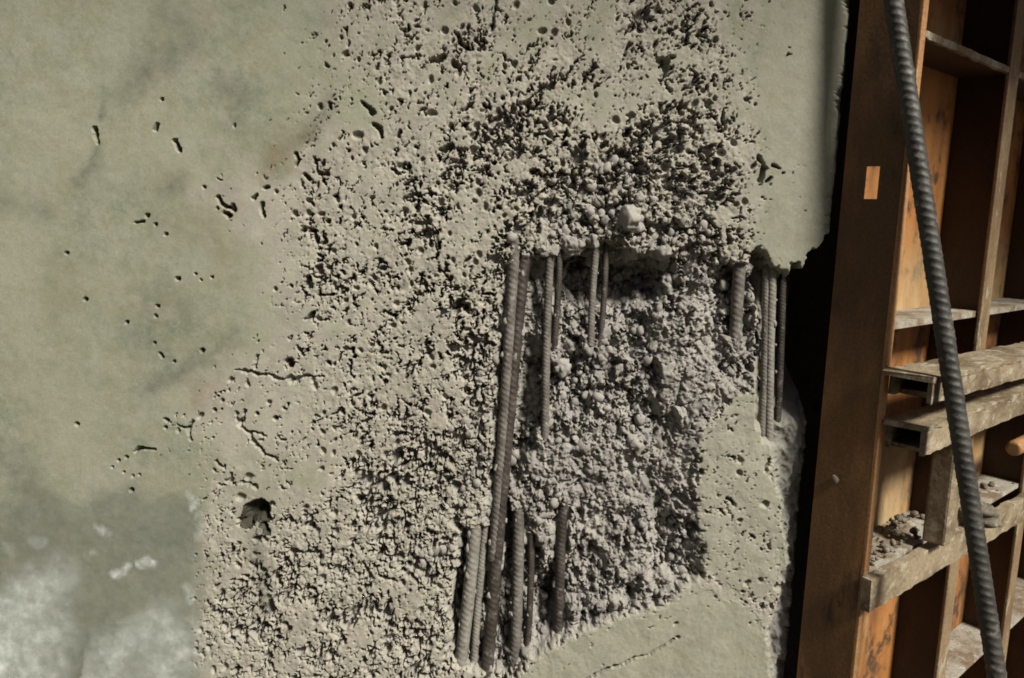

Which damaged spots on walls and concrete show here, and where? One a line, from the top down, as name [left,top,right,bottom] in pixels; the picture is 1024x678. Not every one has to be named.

crack [234,354,326,463]
spalling [418,153,807,678]
leakage [0,498,196,678]